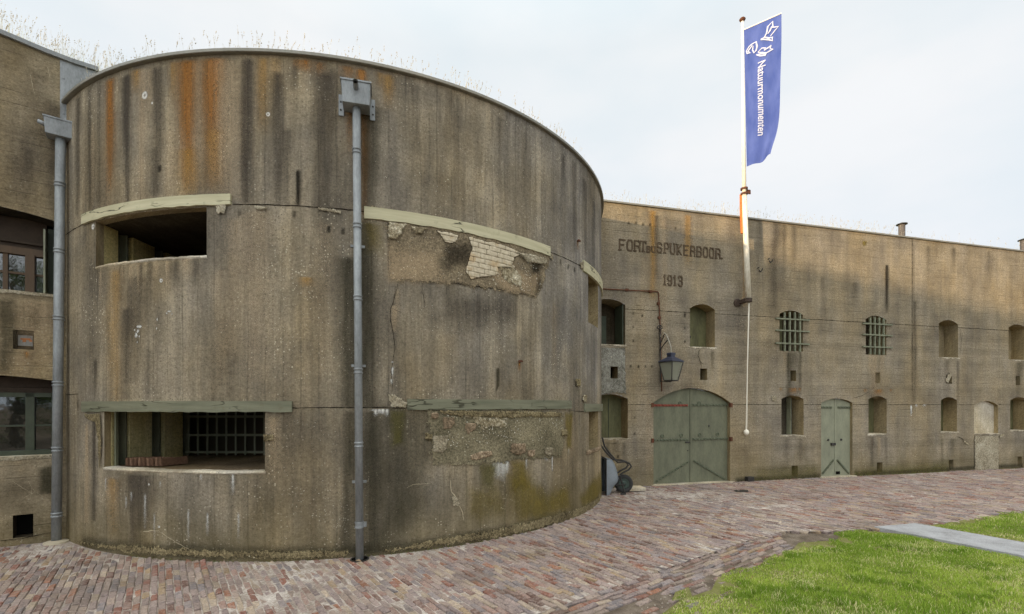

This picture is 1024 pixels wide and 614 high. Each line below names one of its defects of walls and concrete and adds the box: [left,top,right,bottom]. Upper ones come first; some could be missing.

rust [182,61,194,159]
leakage [243,60,252,178]
spalling [388,222,548,288]
crack [388,243,535,387]
spalling [425,433,448,453]